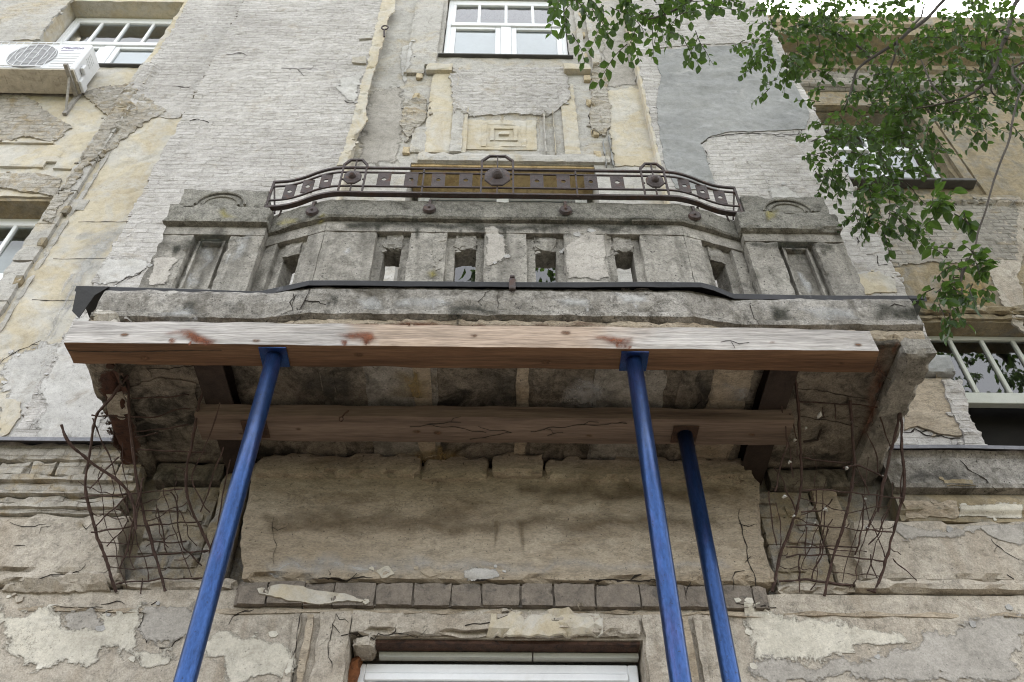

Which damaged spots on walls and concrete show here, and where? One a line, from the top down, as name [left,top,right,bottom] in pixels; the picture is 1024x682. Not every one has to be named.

spalling [0,0,243,223]
peeling [586,13,885,191]
peeling [485,226,511,268]
peeling [0,335,198,437]
rust [97,364,143,466]
peeling [904,374,987,445]
peeling [0,571,195,673]
peeling [204,627,298,682]
spalling [257,584,370,606]
spalling [486,603,604,639]
crack [732,509,776,608]
spalling [734,598,1024,682]